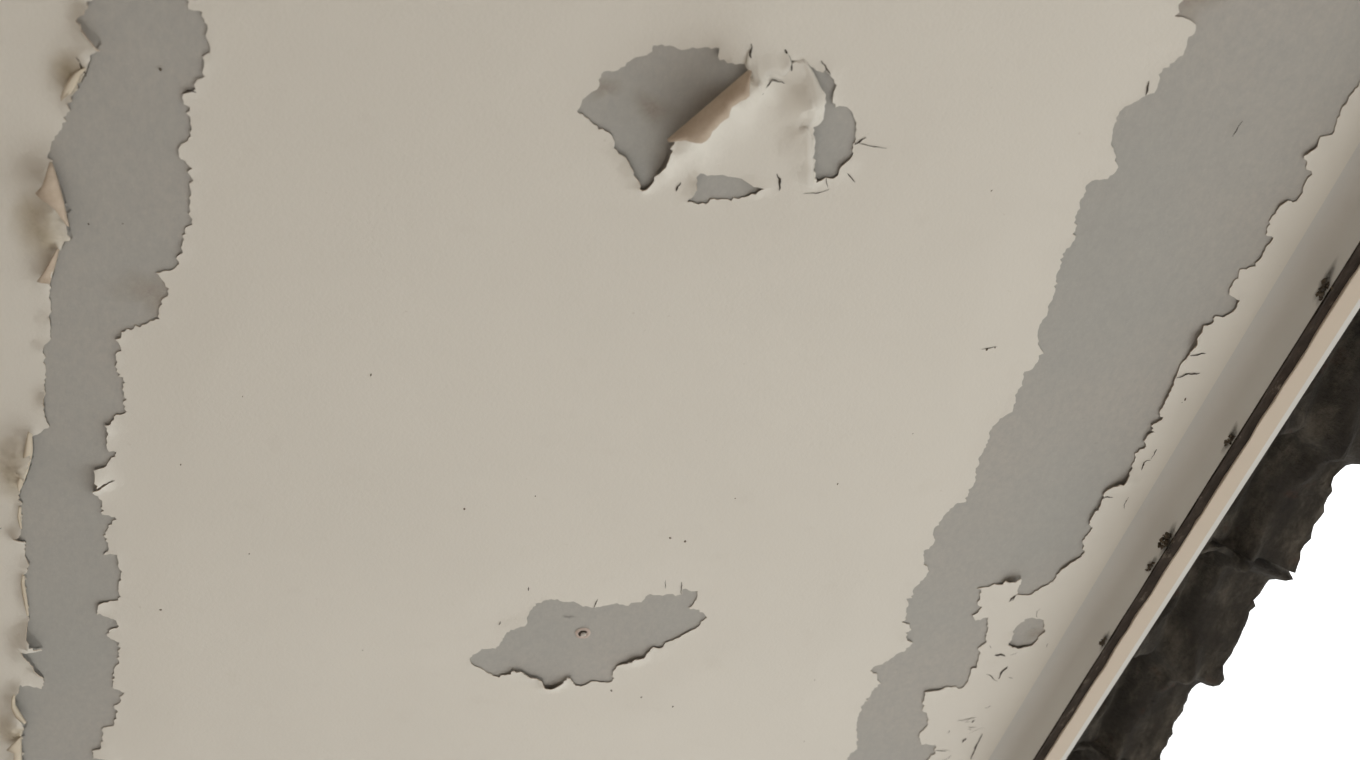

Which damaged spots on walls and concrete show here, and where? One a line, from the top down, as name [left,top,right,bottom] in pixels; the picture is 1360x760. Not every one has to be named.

peeling [0,0,210,760]
peeling [470,589,706,692]
peeling [577,40,856,203]
peeling [848,0,1360,760]